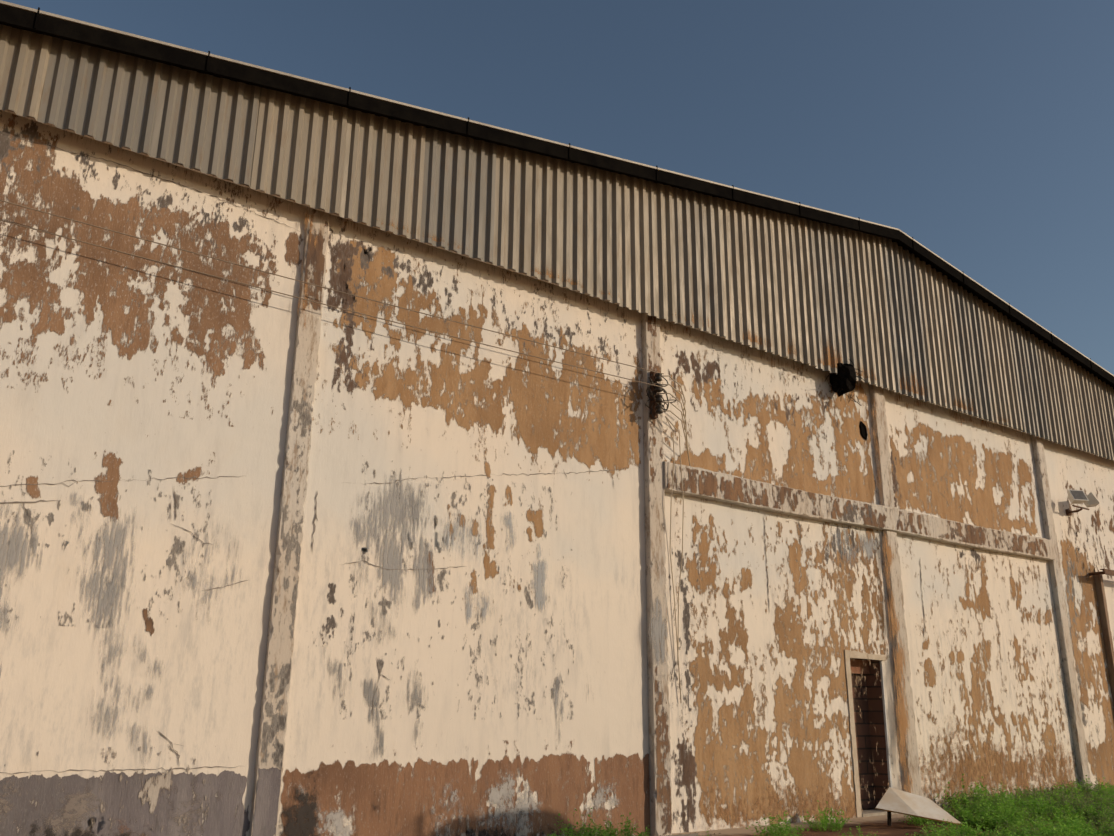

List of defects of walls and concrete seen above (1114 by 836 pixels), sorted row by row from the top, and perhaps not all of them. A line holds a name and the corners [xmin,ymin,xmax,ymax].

peeling [0,110,328,427]
peeling [26,476,41,499]
peeling [89,449,122,523]
peeling [177,452,215,484]
peeling [325,231,1075,827]
leakage [0,450,238,735]
peeling [143,608,155,635]
peeling [1058,466,1114,788]
leakage [31,815,94,836]
spalling [101,746,211,835]
peeling [281,665,672,836]